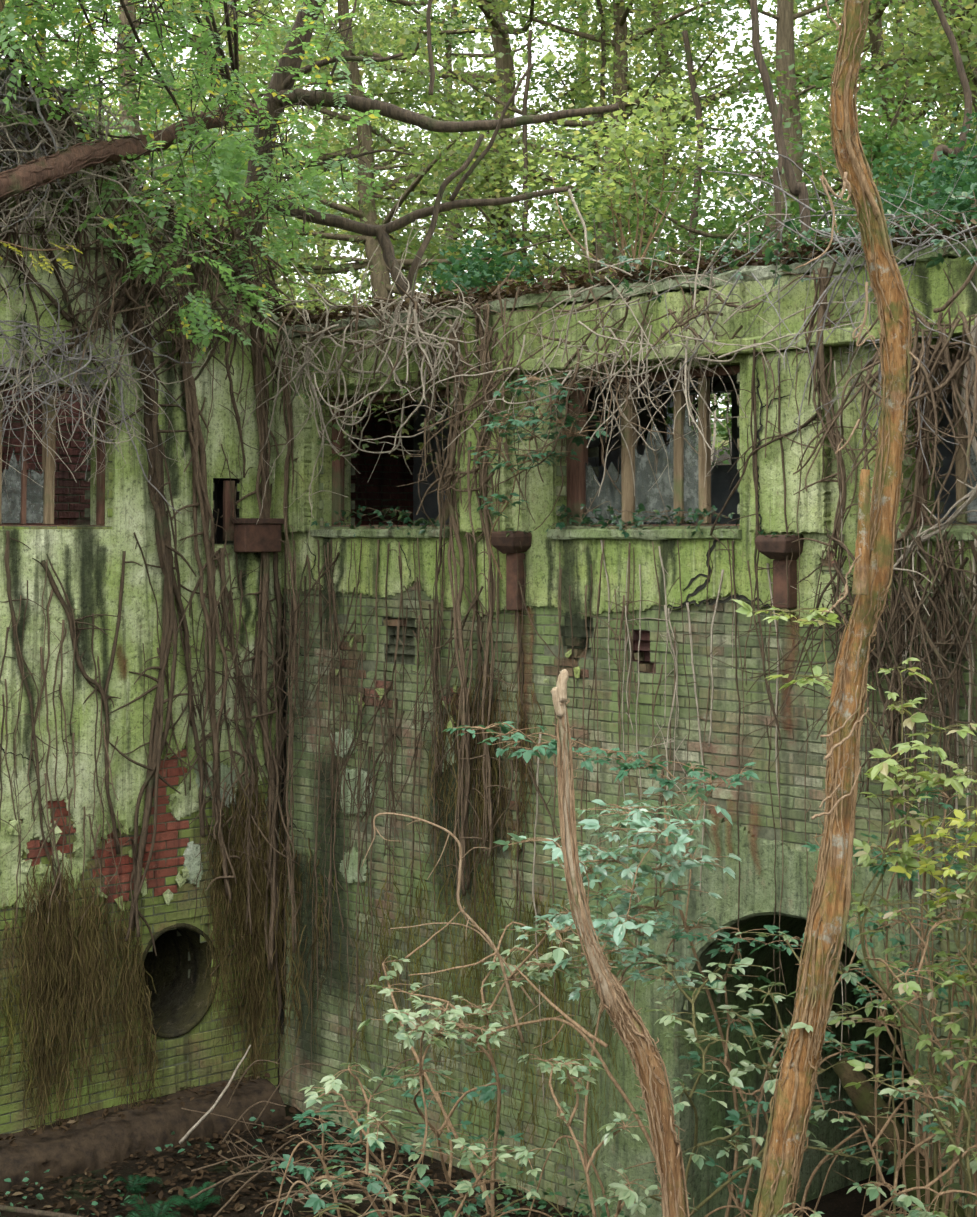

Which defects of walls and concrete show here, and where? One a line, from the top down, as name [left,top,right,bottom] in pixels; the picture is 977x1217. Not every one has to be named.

crack [755,368,789,532]
leakage [5,526,35,779]
leakage [65,523,110,725]
leakage [546,525,592,647]
hole [629,630,656,673]
leakage [659,539,678,610]
crack [667,526,784,609]
spalling [6,749,238,911]